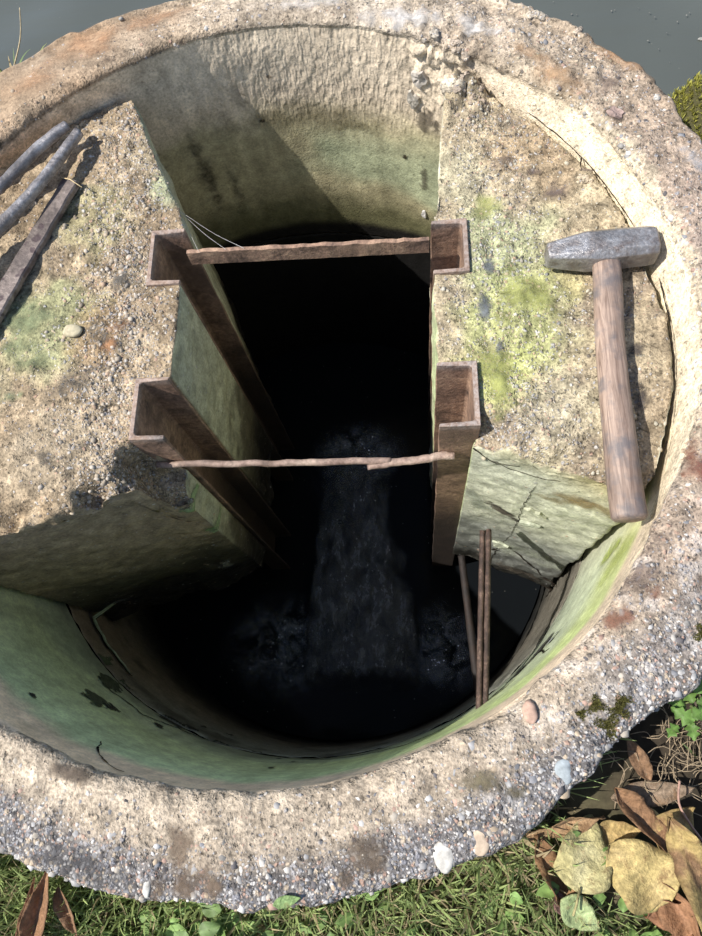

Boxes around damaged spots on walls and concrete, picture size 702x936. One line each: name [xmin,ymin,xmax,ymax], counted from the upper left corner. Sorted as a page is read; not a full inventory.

crack [472,441,567,598]
rust [684,451,702,479]